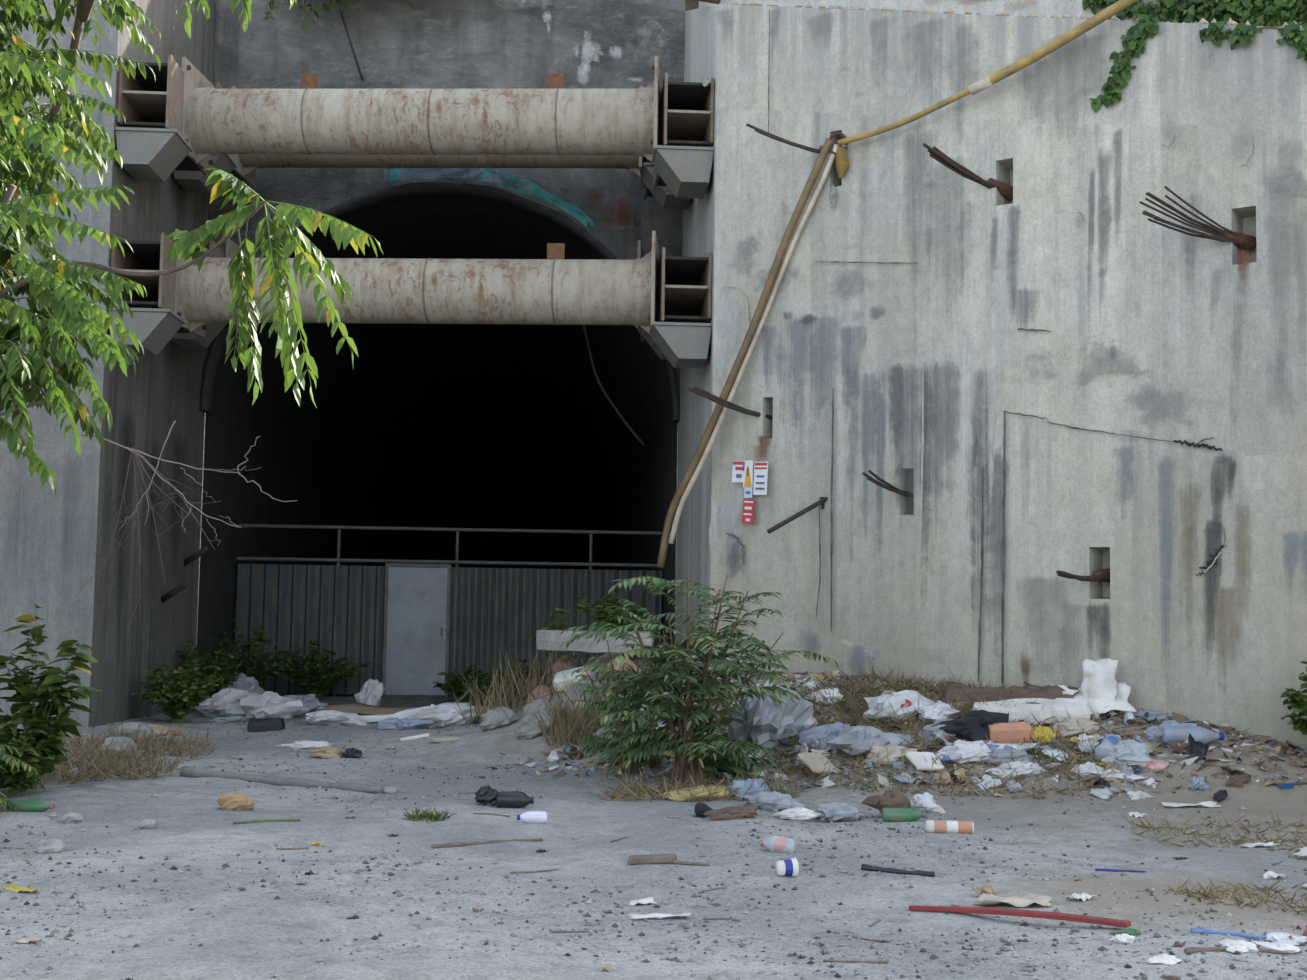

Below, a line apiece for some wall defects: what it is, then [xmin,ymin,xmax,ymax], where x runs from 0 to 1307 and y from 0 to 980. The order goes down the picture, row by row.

leakage [581,43,597,77]
leakage [763,208,1028,566]
crack [1002,411,1222,451]
leakage [1159,463,1171,636]
leakage [1206,457,1235,648]